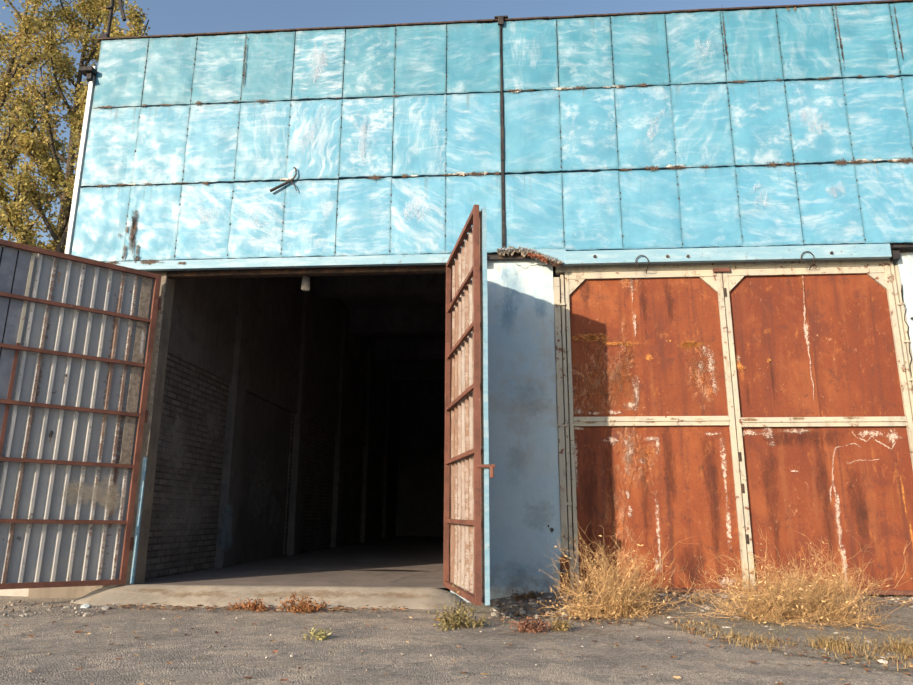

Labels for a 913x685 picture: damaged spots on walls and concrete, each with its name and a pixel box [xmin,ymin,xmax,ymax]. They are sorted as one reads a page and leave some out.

corrosion [108,210,163,265]
peeling [573,377,639,414]
corrosion [669,340,716,399]
peeling [698,347,717,395]
peeling [604,434,644,472]
corrosion [607,429,657,564]
peeling [829,429,898,588]